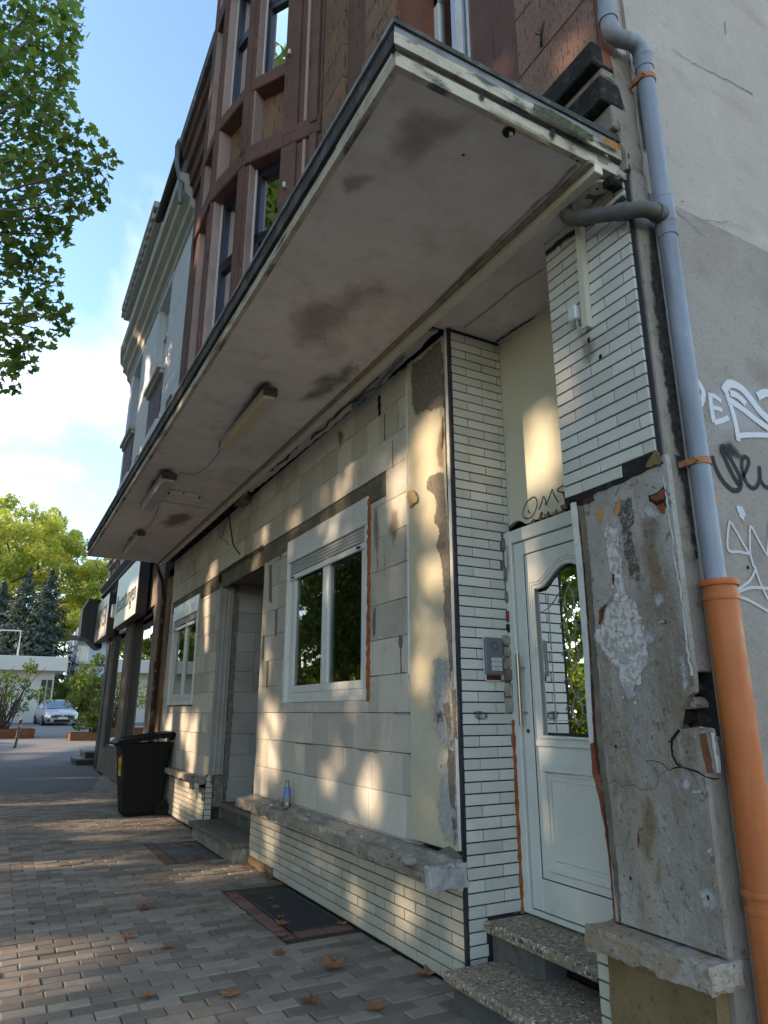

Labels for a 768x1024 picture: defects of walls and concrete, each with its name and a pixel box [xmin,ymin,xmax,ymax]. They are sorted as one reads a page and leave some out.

leakage [479,90,621,164]
peeling [406,473,458,846]
crack [610,729,719,790]
peeling [645,450,721,774]